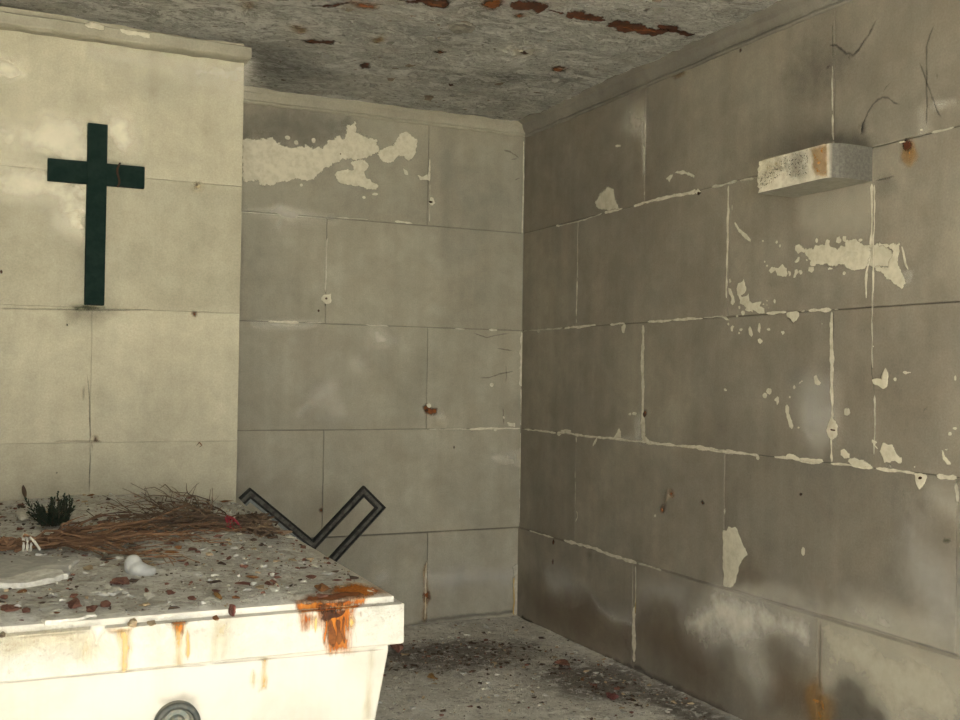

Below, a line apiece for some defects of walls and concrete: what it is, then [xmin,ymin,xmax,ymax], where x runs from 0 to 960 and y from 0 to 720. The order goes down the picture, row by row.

corrosion [400,0,450,8]
corrosion [296,26,335,45]
flaking render [242,121,429,199]
corrosion [812,146,827,175]
flaking render [764,236,908,289]
flaking render [724,279,785,344]
flaking render [872,368,911,389]
corrosion [423,403,437,415]
flaking render [872,439,902,467]
flaking render [722,526,748,588]
corrosion [296,583,385,653]
corrosion [172,621,190,657]